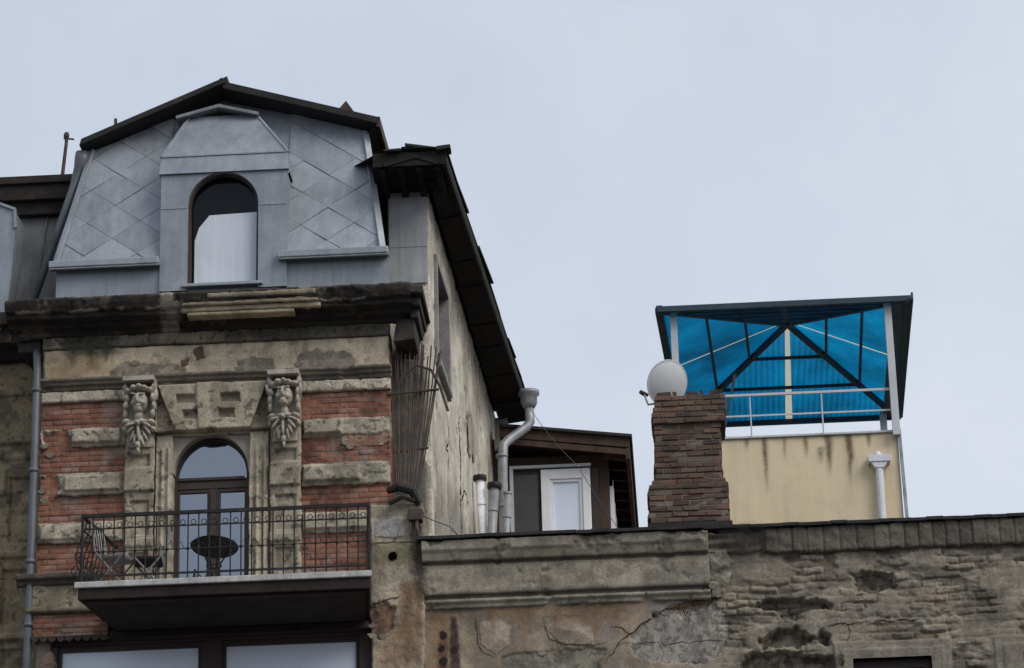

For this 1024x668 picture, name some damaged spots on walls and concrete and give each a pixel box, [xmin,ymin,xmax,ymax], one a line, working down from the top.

peeling [110,346,205,385]
peeling [294,348,356,367]
crack [447,413,469,529]
spalling [367,602,395,639]
crack [543,600,721,661]